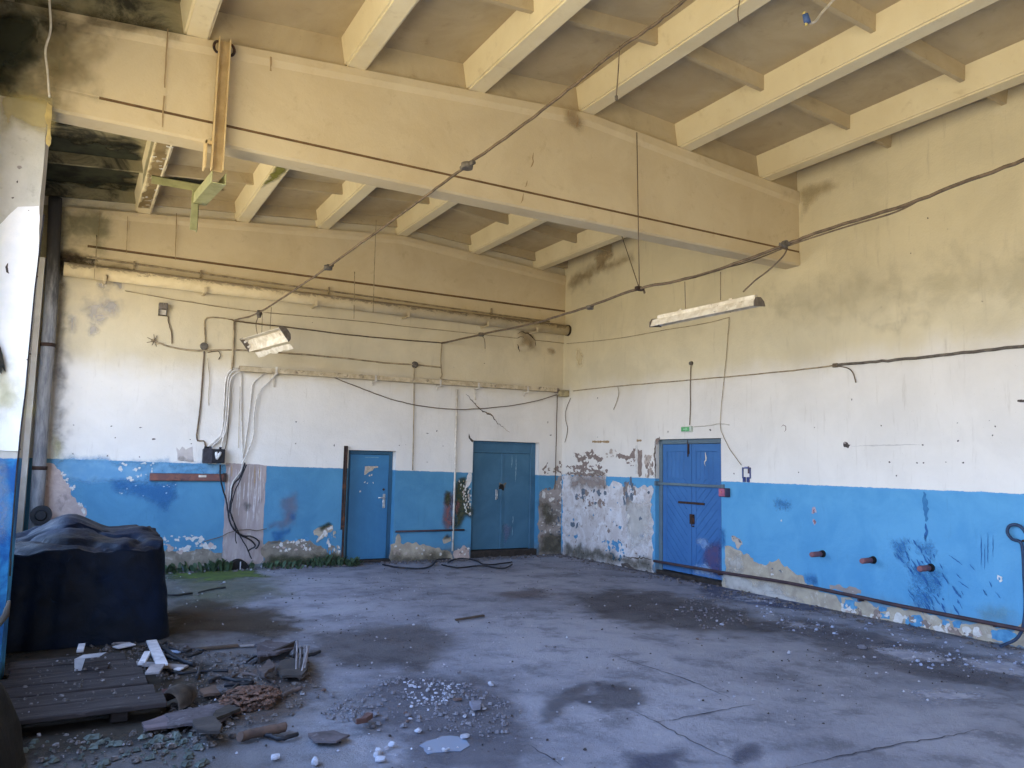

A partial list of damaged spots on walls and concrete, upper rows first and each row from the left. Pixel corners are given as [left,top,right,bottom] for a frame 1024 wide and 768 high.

water stain [0,11,141,191]
peeling [44,463,87,520]
peeling [537,445,655,573]
peeling [163,535,223,569]
flaking render [261,523,340,567]
flaking render [389,534,470,561]
peeling [679,535,1024,674]